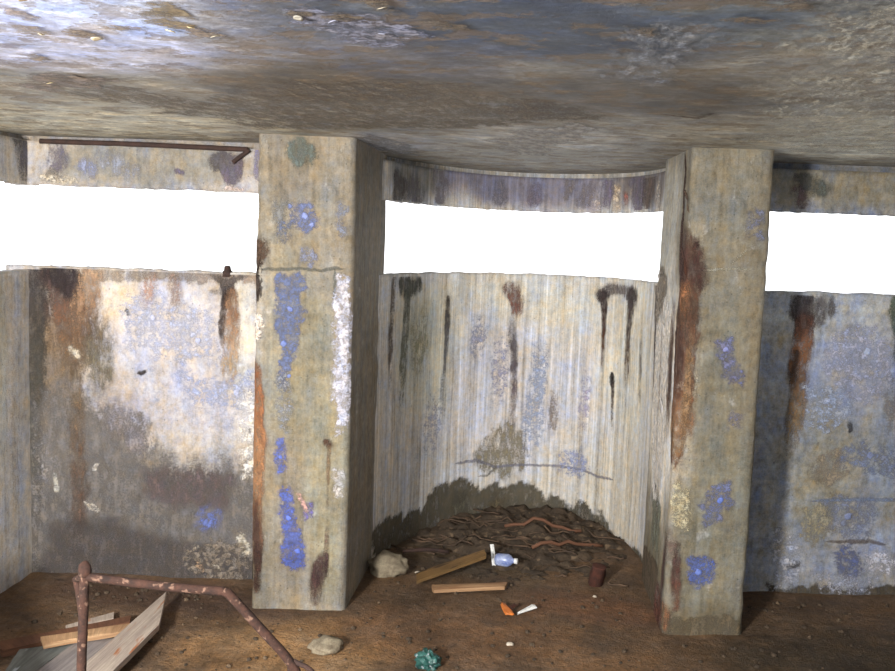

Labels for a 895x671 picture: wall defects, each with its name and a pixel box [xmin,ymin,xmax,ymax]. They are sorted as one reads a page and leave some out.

leakage [27,269,256,579]
rust [212,275,244,378]
rust [252,358,266,593]
rust [666,219,708,468]
rust [784,295,836,447]